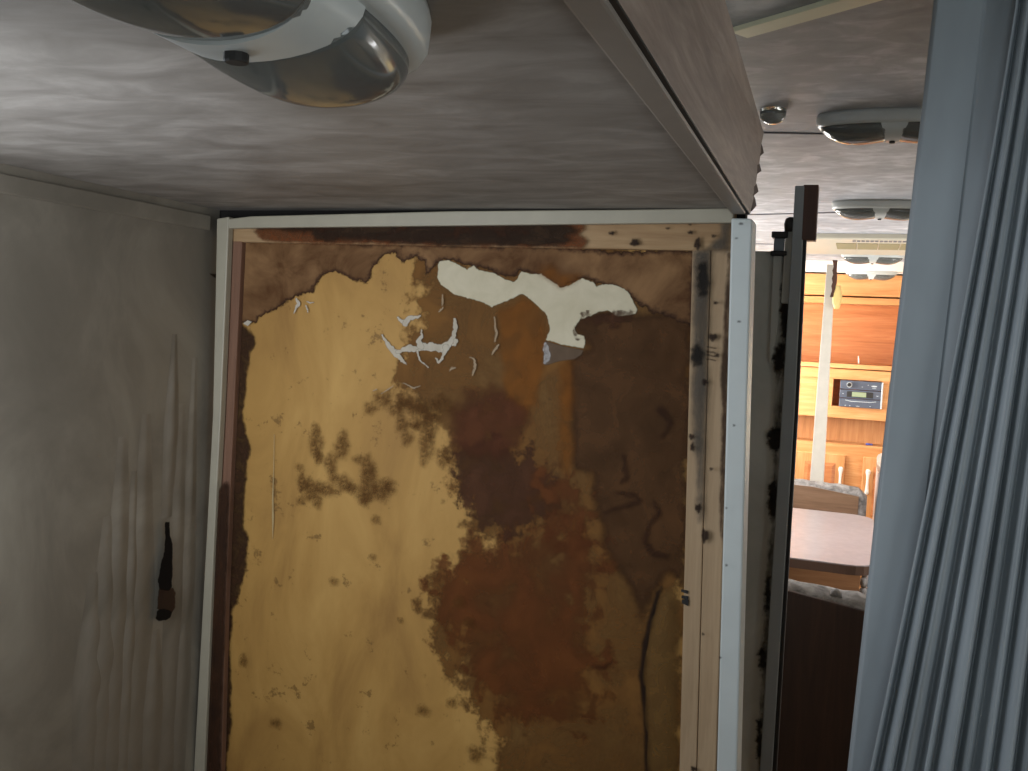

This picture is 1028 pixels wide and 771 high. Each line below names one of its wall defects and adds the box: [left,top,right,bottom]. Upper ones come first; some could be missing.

water stain [206,223,731,771]
peeling [437,260,637,365]
water stain [756,284,788,771]